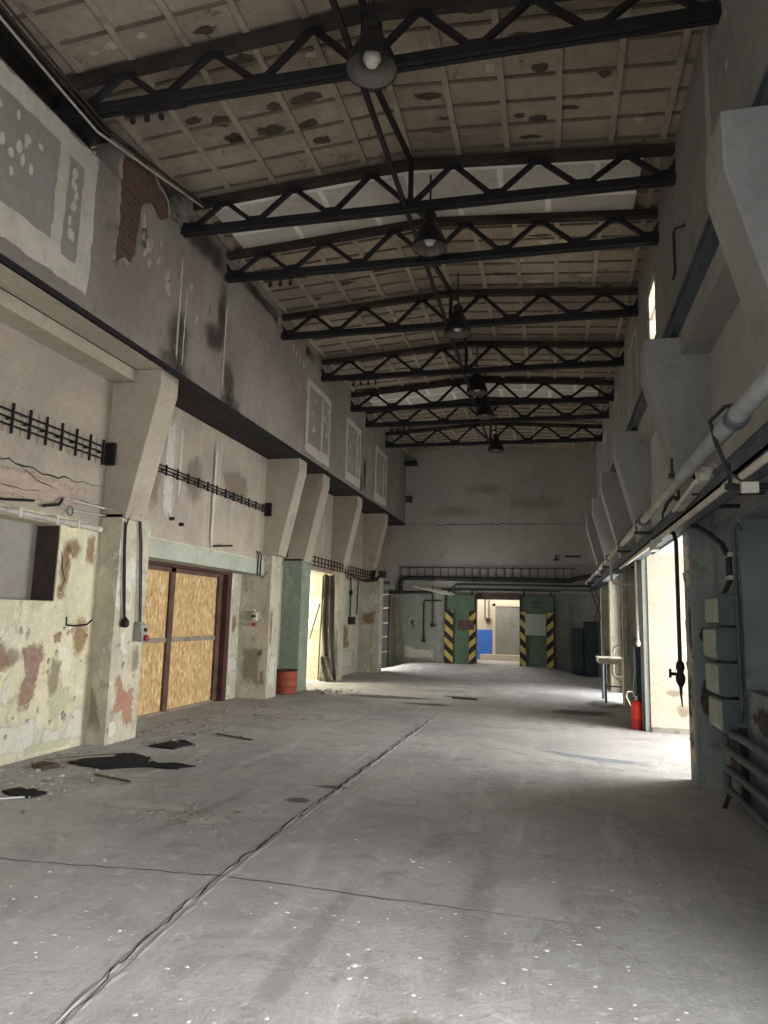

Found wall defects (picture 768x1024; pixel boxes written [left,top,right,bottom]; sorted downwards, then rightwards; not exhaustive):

spalling [112,148,171,297]
crack [0,457,103,507]
peeling [0,627,88,725]
peeling [106,621,135,738]
crack [0,708,647,1024]